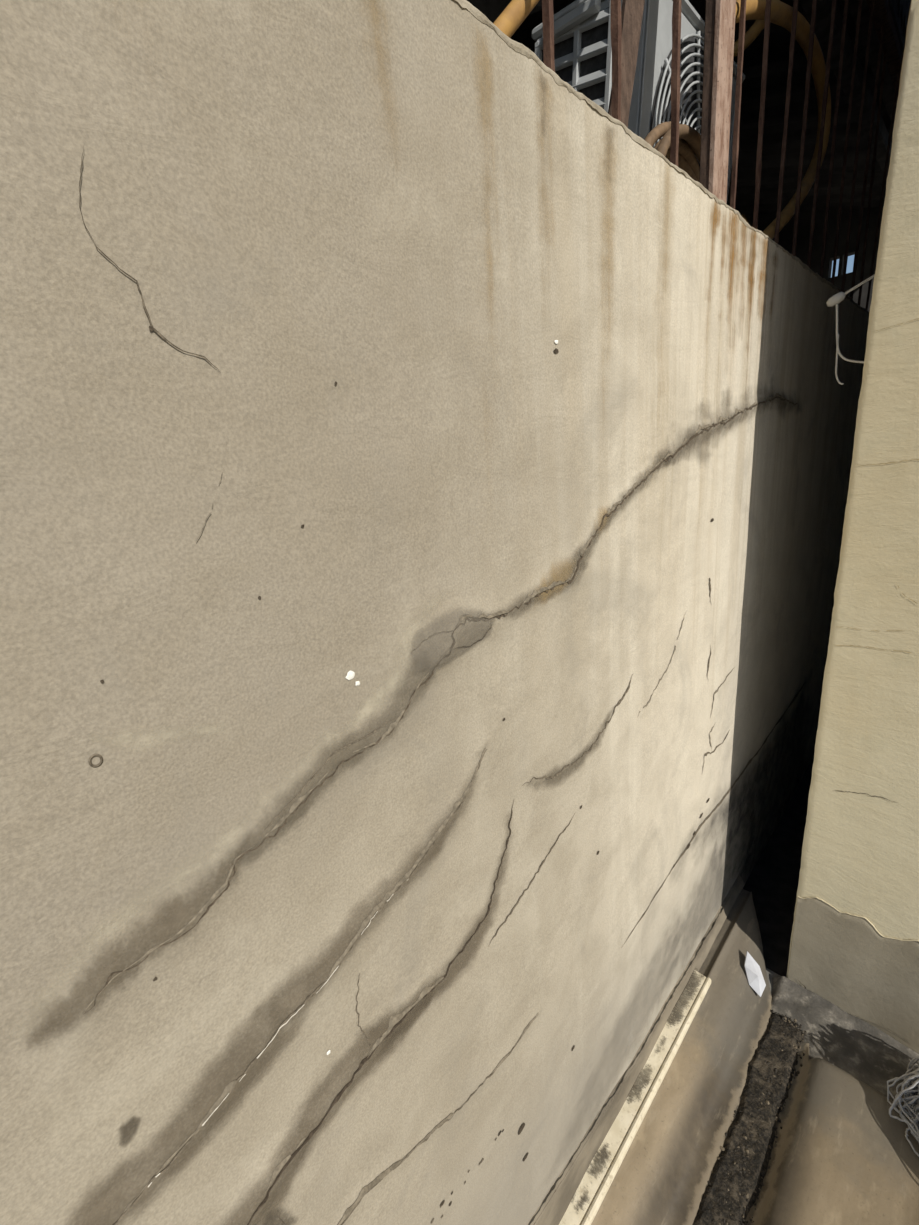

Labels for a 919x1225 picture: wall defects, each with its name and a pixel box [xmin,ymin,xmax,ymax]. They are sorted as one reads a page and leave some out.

crack [79,154,220,372]
corrosion [713,204,776,302]
water stain [75,892,387,1225]
water stain [35,626,431,1041]
water stain [227,855,505,1225]
crack [114,578,741,1225]
crack [82,393,805,1015]
water stain [546,715,610,784]
water stain [571,1145,611,1211]
water stain [628,1066,652,1104]
water stain [667,971,704,1026]
water stain [711,693,805,876]